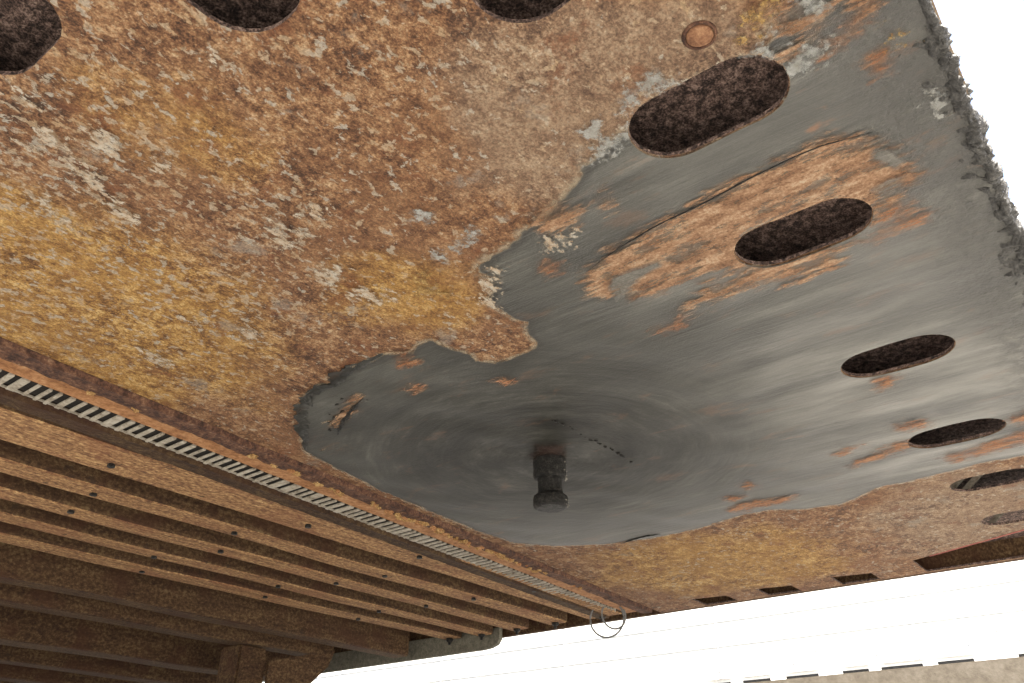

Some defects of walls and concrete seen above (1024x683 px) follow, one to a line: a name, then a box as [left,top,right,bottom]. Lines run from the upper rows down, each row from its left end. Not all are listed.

rust [530,183,619,234]
rust [576,131,931,335]
rust [328,394,363,427]
rust [831,419,927,468]
rust [945,415,1024,464]
rust [723,481,799,513]
rust [370,501,548,575]